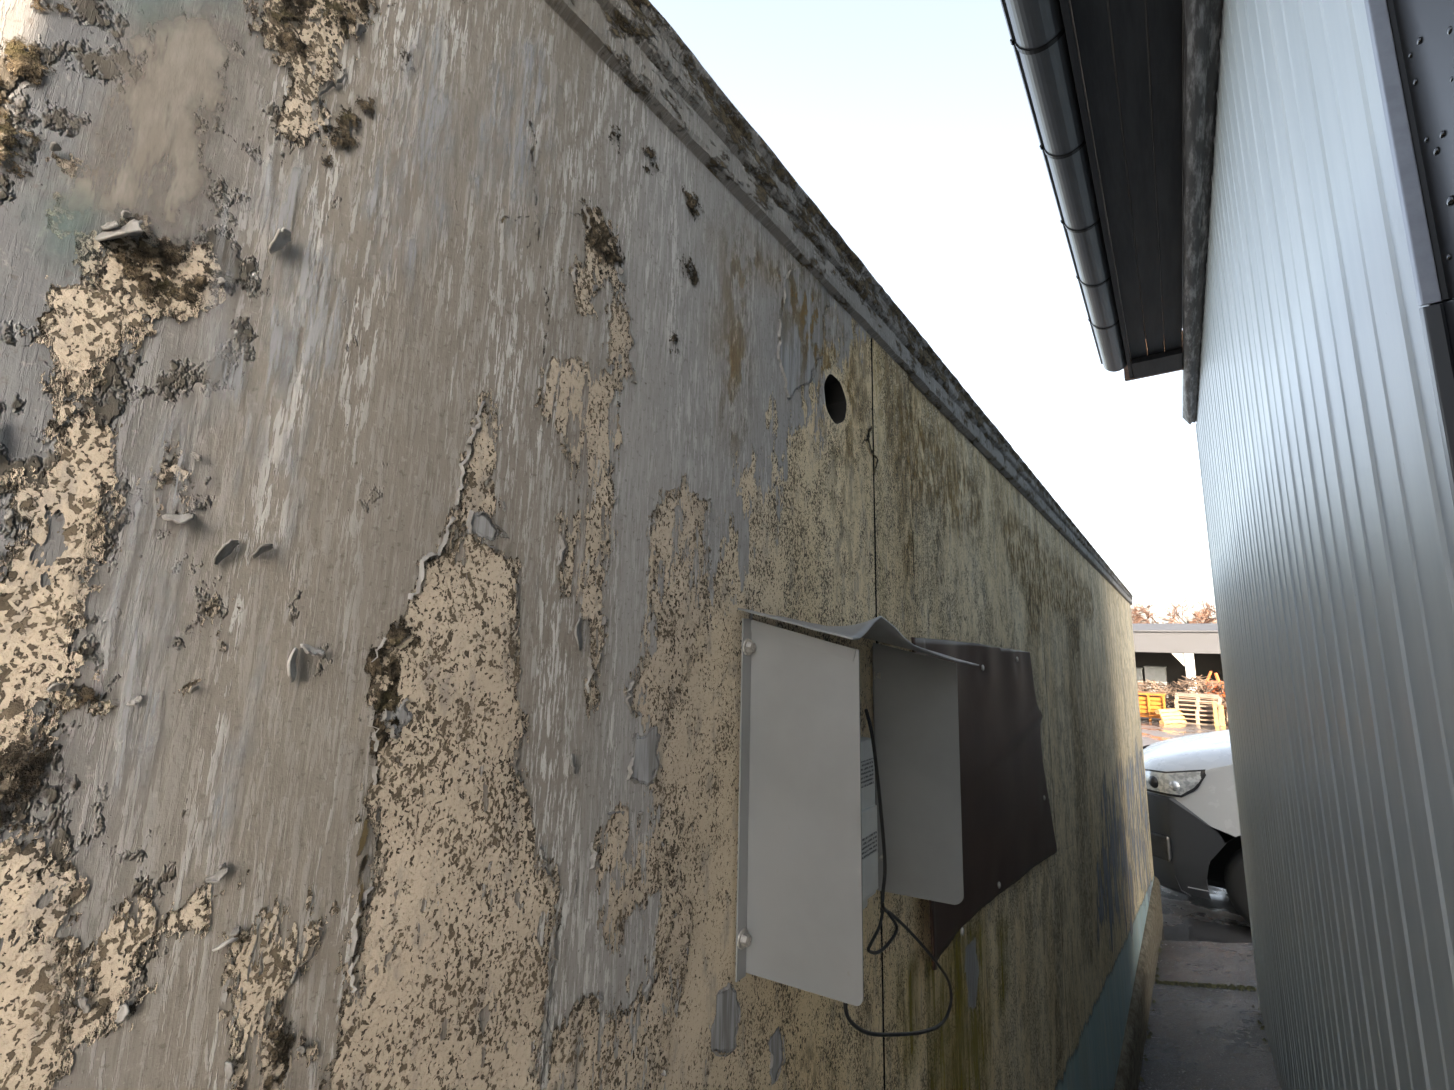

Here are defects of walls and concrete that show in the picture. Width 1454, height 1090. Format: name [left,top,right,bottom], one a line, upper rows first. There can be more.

peeling [243,0,382,149]
peeling [0,141,694,1090]
peeling [619,472,712,729]